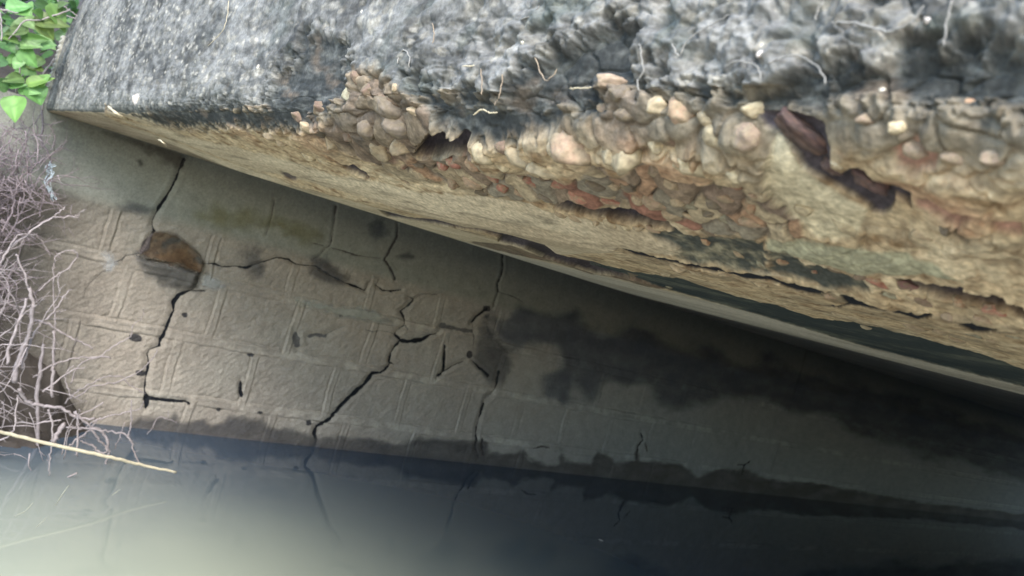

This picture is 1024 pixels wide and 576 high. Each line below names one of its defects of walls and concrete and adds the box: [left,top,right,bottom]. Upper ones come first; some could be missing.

crack [151,158,186,234]
crack [143,205,517,443]
spalling [104,65,1024,369]
damp [486,309,1024,476]